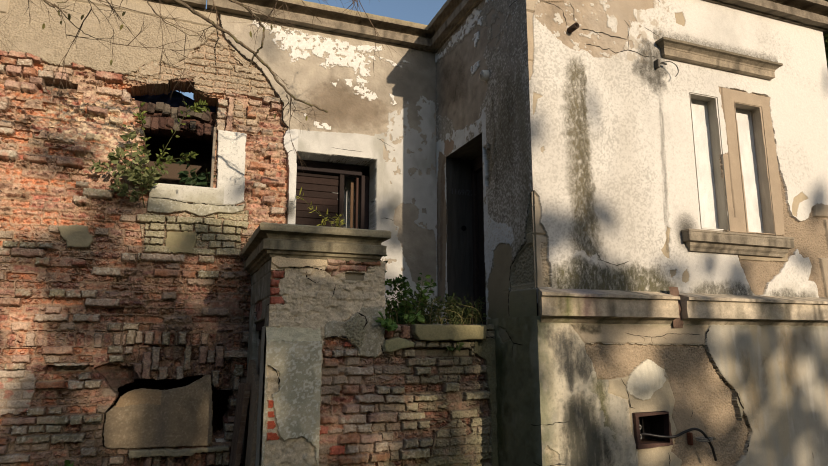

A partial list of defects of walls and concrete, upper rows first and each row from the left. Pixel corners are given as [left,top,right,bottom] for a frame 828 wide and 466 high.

peeling [252,20,410,101]
peeling [435,0,494,62]
peeling [526,0,655,81]
spalling [0,69,143,235]
spalling [103,93,454,336]
crack [506,193,532,350]
leakage [565,61,600,258]
spalling [725,156,828,298]
spalling [47,363,140,391]
spalling [264,362,367,466]
leakage [548,330,611,466]
spalling [585,342,753,466]